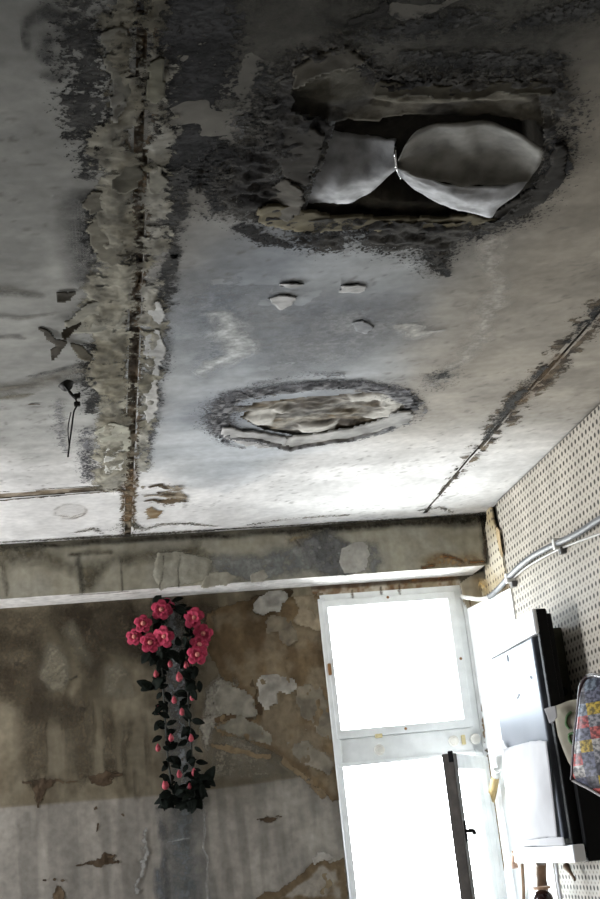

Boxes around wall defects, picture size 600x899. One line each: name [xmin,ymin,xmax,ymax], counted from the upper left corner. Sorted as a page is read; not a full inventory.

damp [22,0,113,181]
spalling [254,47,568,233]
crack [0,0,161,537]
damp [68,199,102,282]
peeling [268,282,304,310]
damp [131,0,600,469]
damp [0,341,109,483]
crack [425,299,600,511]
peeling [339,542,370,574]
damp [0,506,488,899]
spalling [152,551,339,802]
peeling [76,852,119,868]